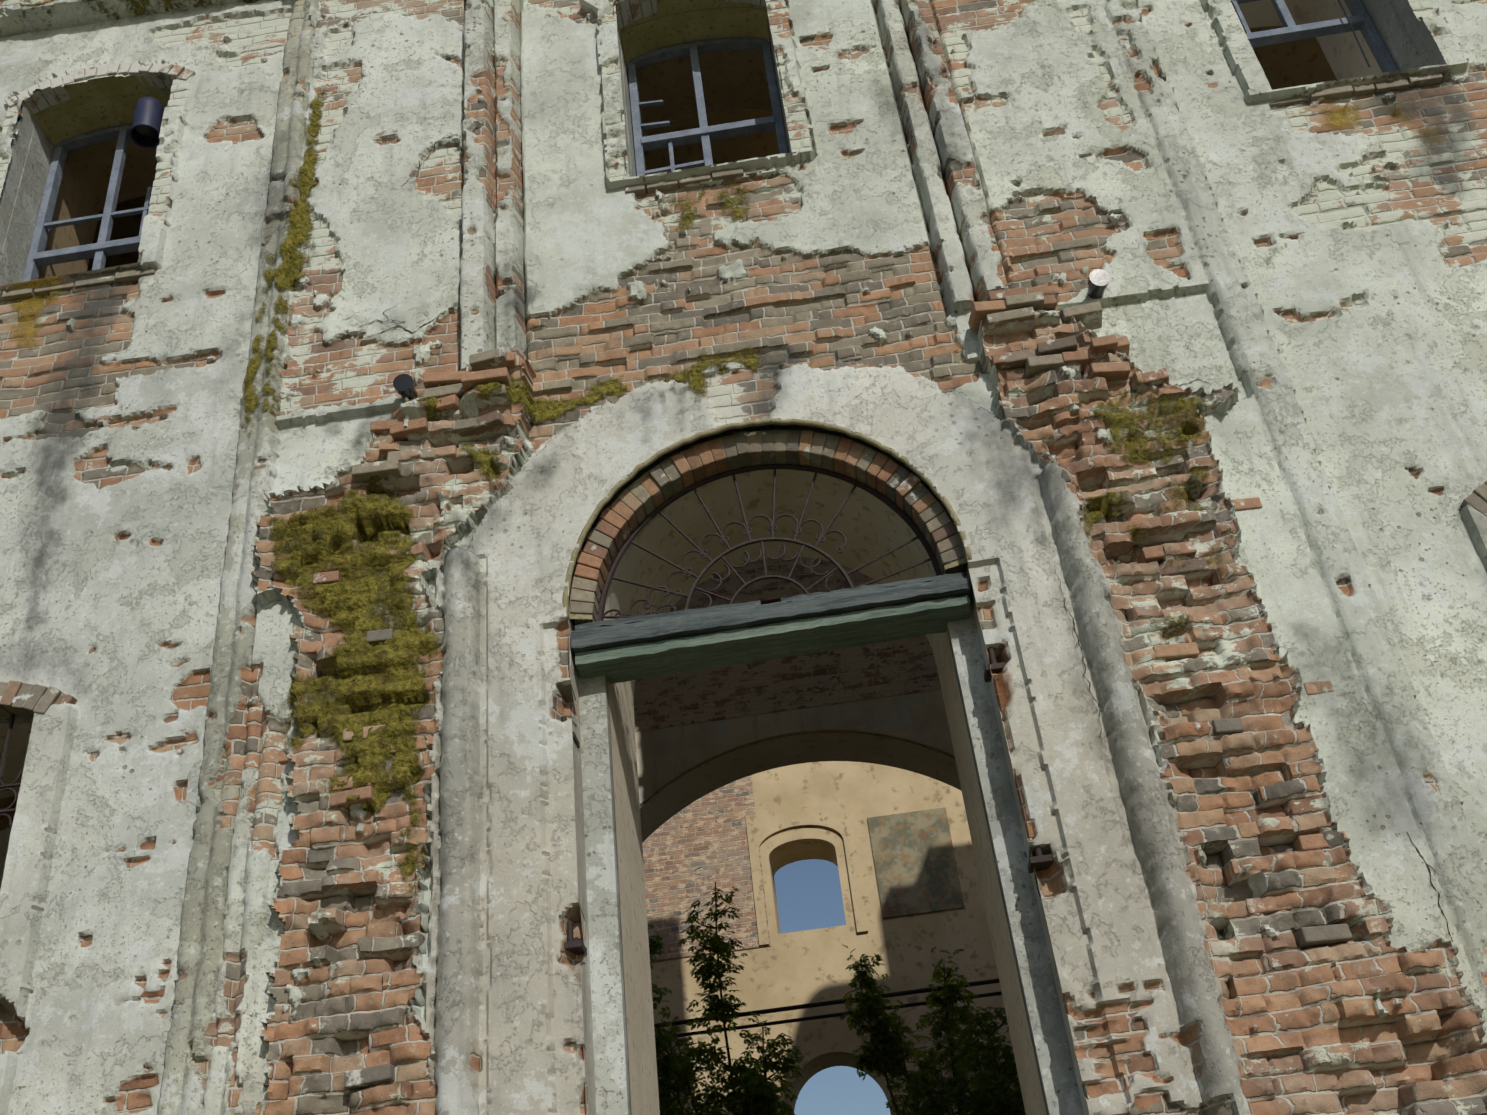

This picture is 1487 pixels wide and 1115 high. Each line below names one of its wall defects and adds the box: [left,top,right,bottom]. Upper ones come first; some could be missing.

spalling [497,0,611,32]
spalling [798,31,877,73]
spalling [893,0,1035,115]
spalling [1042,0,1154,171]
spalling [827,119,864,159]
spalling [1254,63,1487,269]
spalling [0,251,222,490]
spalling [200,163,1487,1115]
spalling [171,779,188,803]
spalling [116,836,176,870]
spalling [103,1063,159,1114]